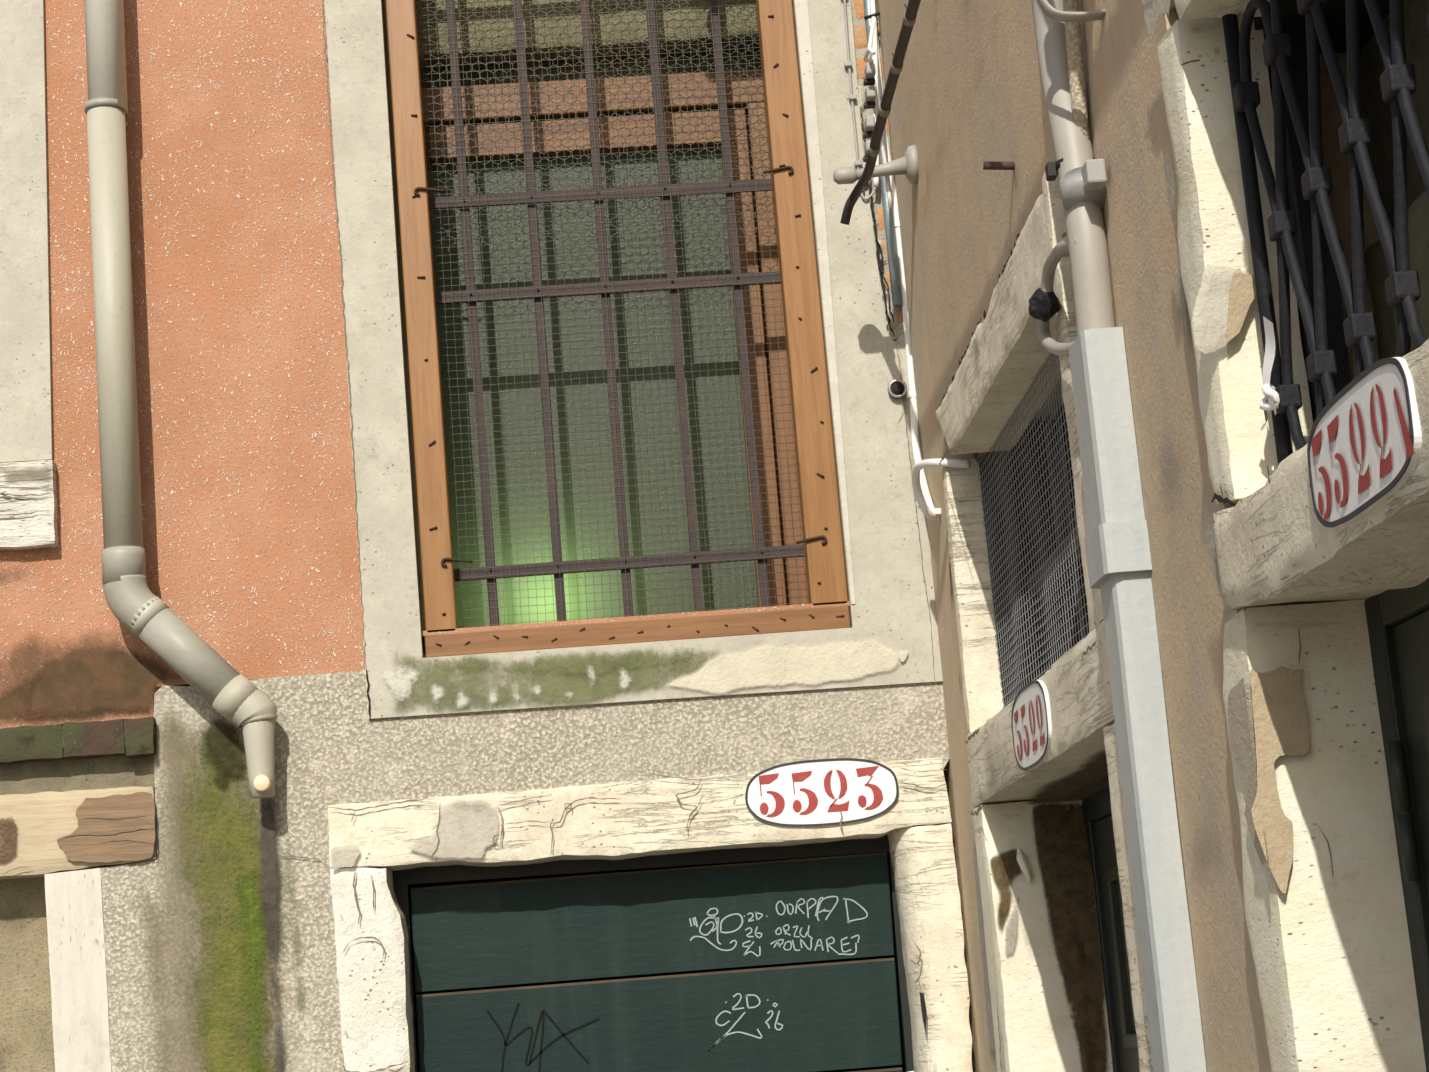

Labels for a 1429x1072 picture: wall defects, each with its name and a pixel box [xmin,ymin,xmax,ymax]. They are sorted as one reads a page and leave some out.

damp [0,644,176,720]
peeling [57,792,155,863]
peeling [1228,666,1310,894]
damp [147,721,262,1072]
spalling [990,847,1032,954]